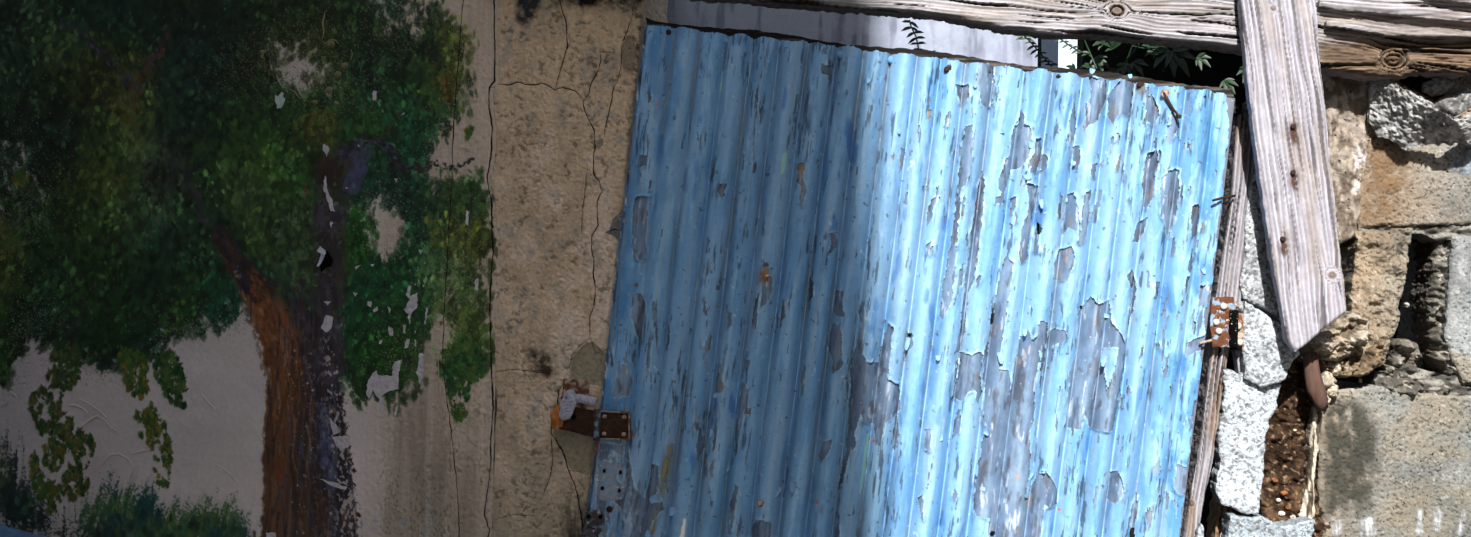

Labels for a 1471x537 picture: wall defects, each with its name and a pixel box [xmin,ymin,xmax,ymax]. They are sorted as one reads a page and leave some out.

peeling [321,301,333,332]
peeling [353,250,428,415]
crack [442,0,634,537]
peeling [606,85,727,261]
peeling [592,238,815,537]
peeling [774,159,828,210]
peeling [811,43,1213,537]